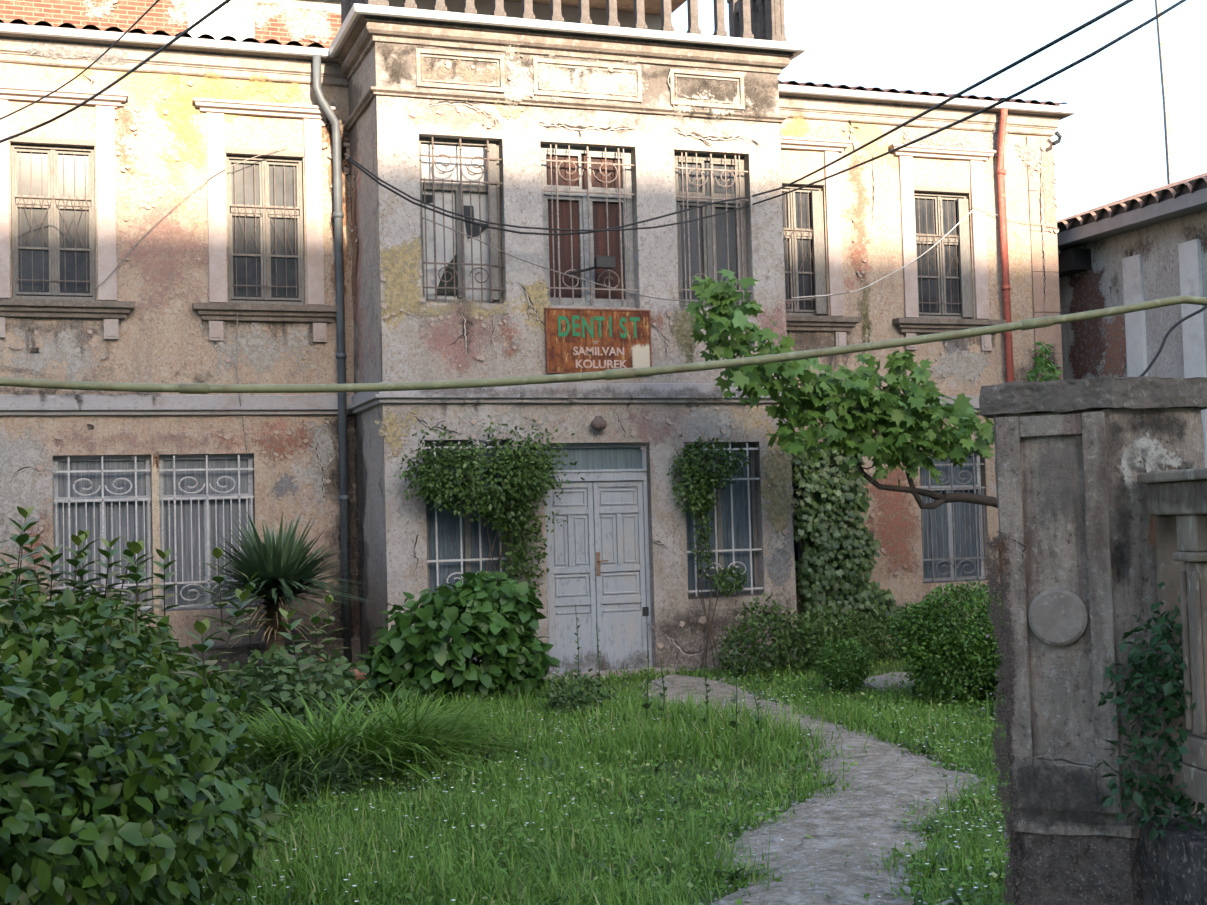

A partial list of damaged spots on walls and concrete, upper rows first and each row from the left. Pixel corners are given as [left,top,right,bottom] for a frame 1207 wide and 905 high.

flaking render [83,0,118,18]
flaking render [165,0,195,26]
flaking render [113,71,358,385]
peeling [379,238,518,376]
flaking render [0,420,336,573]
water stain [1094,412,1207,585]